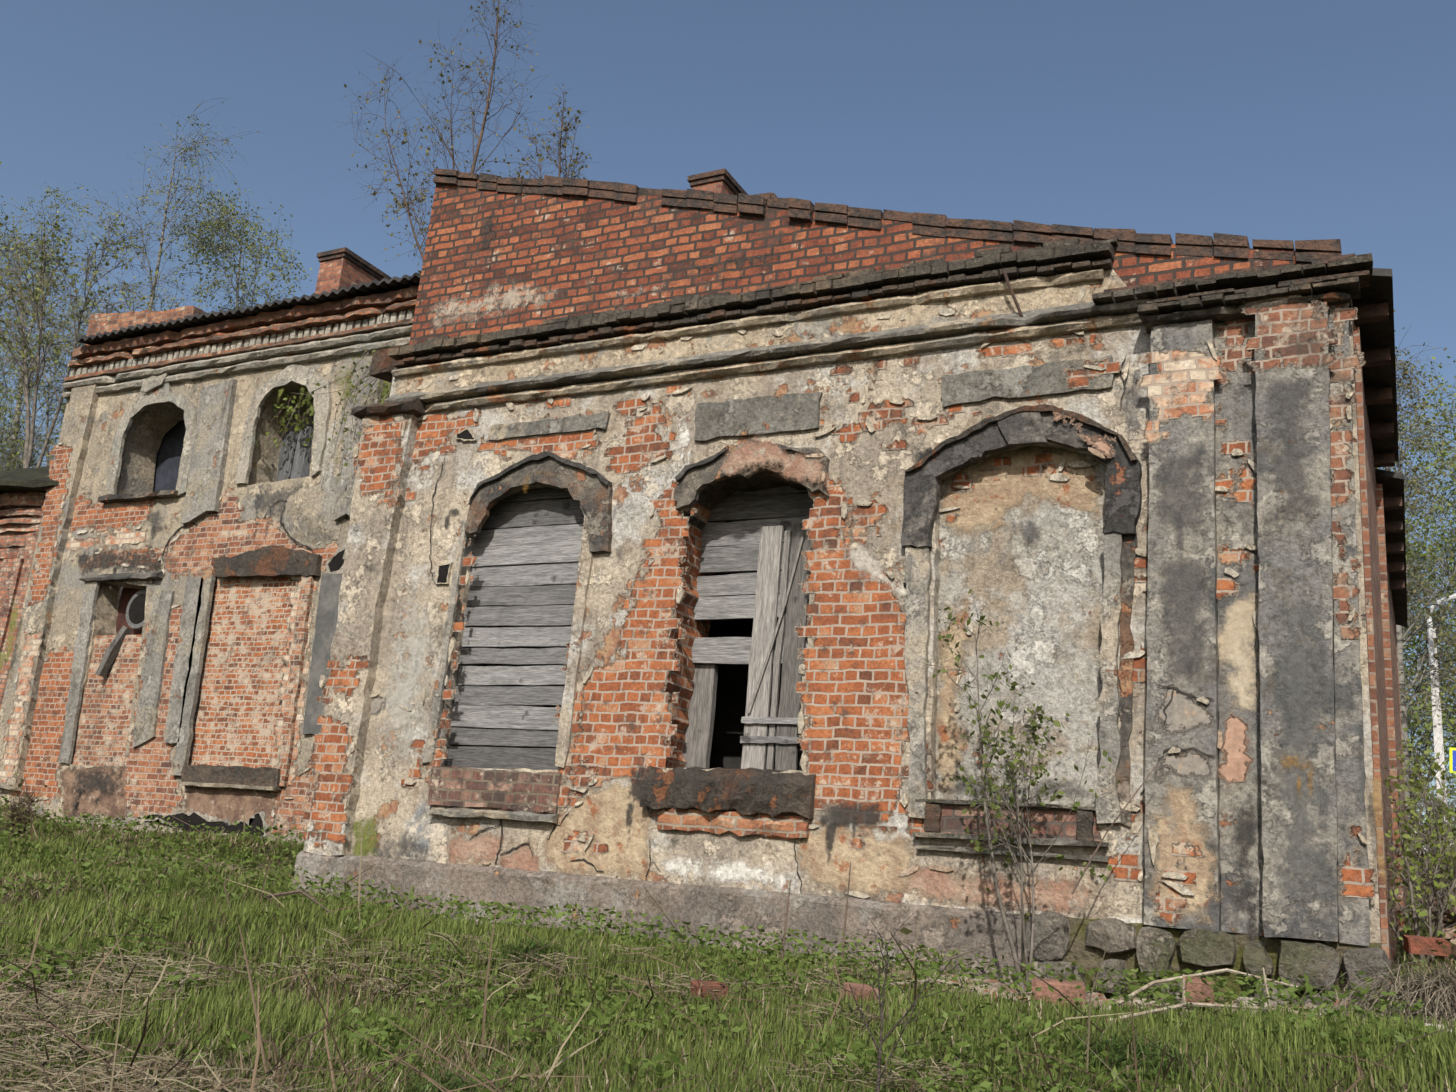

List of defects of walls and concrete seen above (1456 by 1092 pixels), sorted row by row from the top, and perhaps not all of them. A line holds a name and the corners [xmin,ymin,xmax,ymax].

spalling [0,441,387,849]
spalling [401,527,481,788]
spalling [352,361,692,506]
spalling [449,480,697,879]
spalling [720,354,1116,914]
spalling [975,291,1371,639]
peeling [1099,537,1260,926]
damp [1157,447,1204,545]
damp [1164,562,1204,675]
damp [1269,379,1313,518]